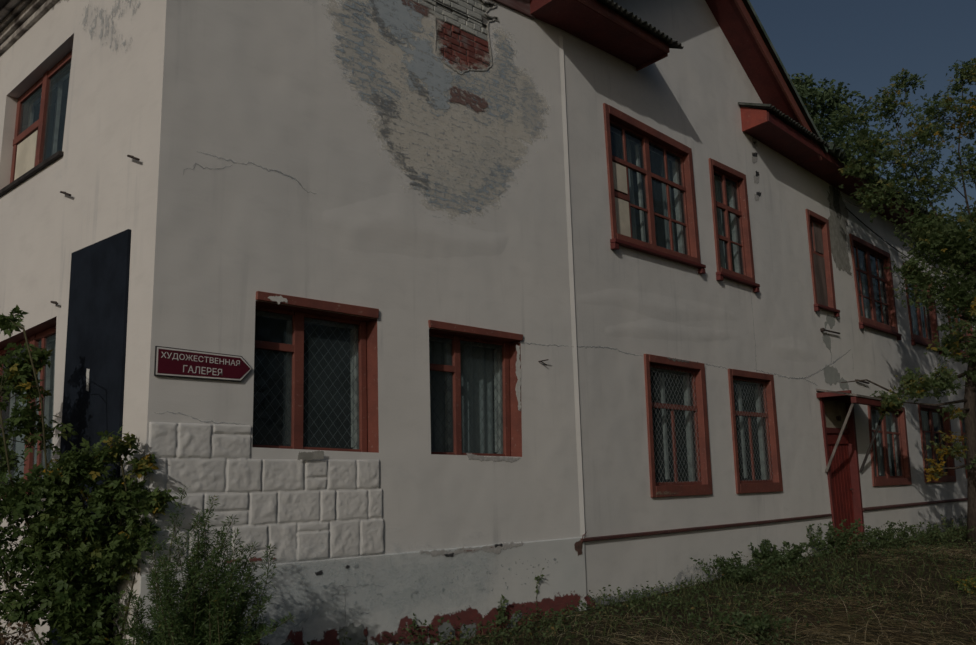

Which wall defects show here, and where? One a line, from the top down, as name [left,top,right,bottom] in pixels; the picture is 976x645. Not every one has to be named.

peeling [329,0,548,216]
peeling [264,570,661,645]